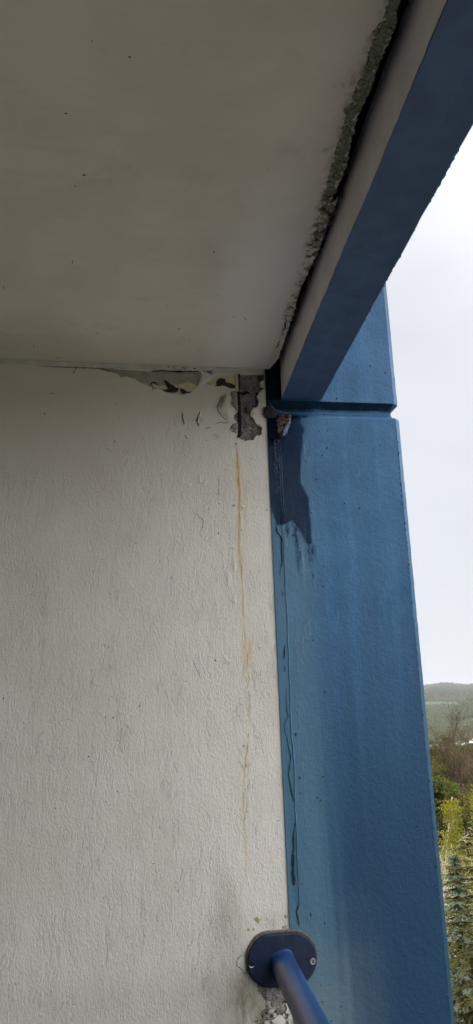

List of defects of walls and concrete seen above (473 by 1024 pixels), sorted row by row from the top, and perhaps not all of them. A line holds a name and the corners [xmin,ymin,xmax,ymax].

spalling [310,0,401,254]
spalling [99,368,292,522]
damp [267,416,311,578]
crack [284,647,299,924]